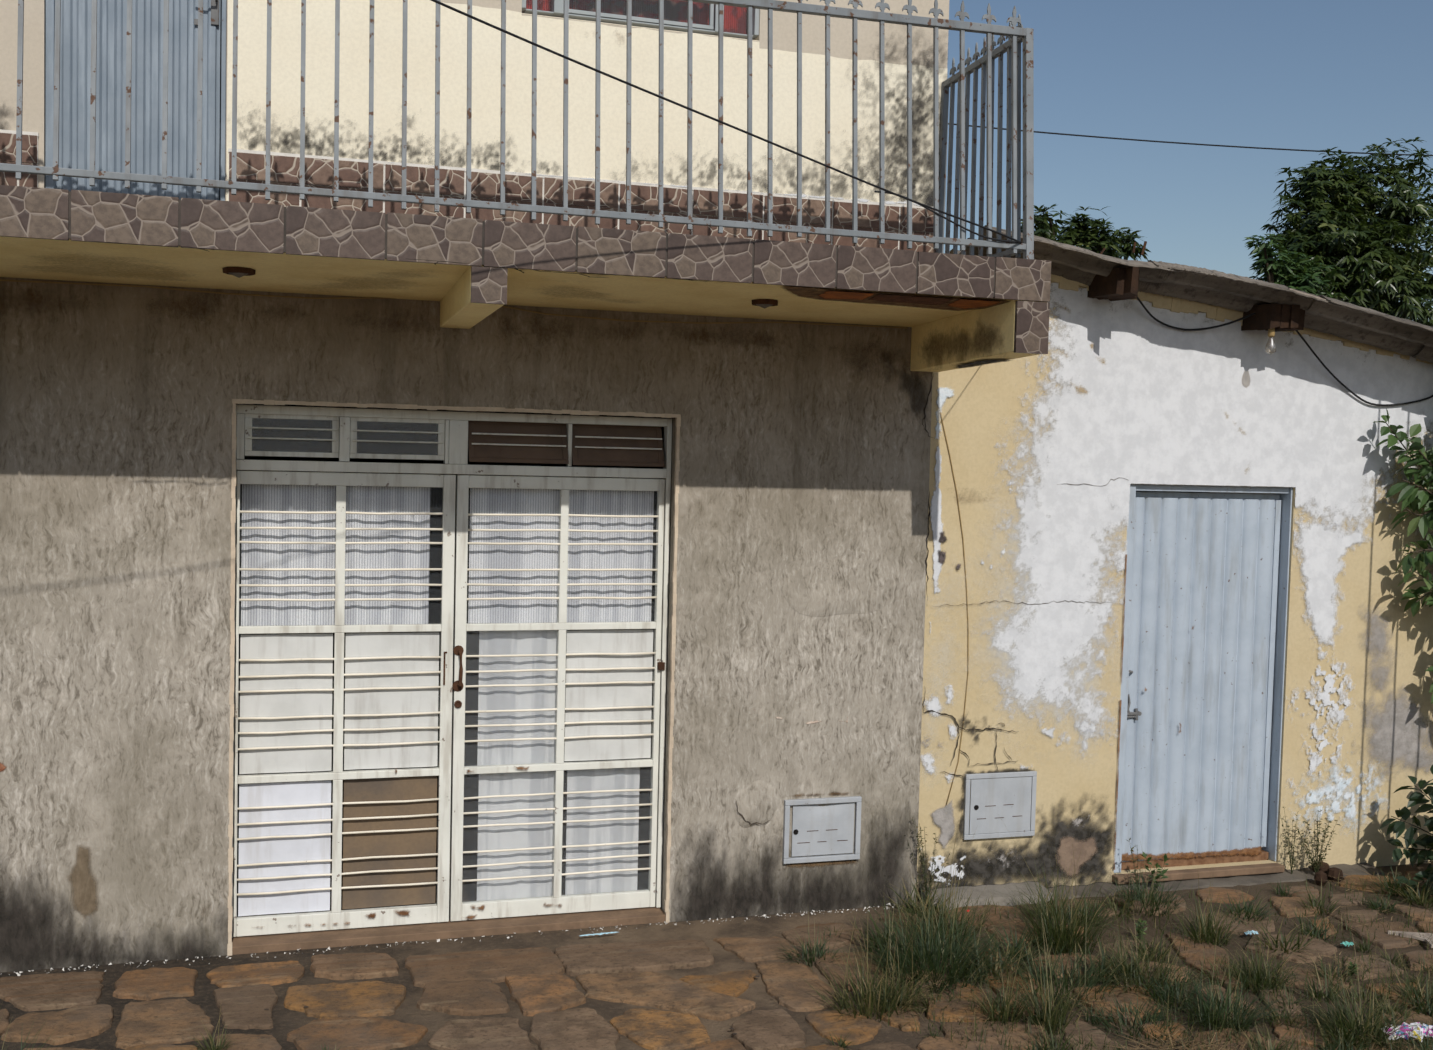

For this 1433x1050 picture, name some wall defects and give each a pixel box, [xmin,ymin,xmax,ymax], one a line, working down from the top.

leakage [789,52,933,206]
peeling [930,387,954,593]
peeling [981,283,1433,821]
peeling [920,739,952,783]
peeling [924,685,957,739]
leakage [0,847,214,973]
leakage [677,769,1114,922]
spalling [920,802,966,884]